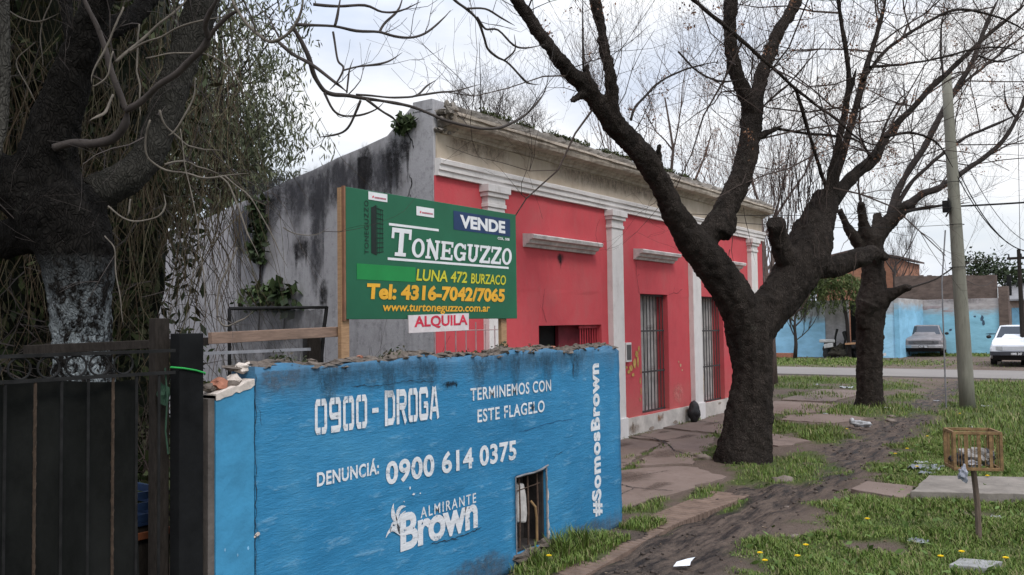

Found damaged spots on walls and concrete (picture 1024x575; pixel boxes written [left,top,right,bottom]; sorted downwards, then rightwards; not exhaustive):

leakage [250,136,410,304]